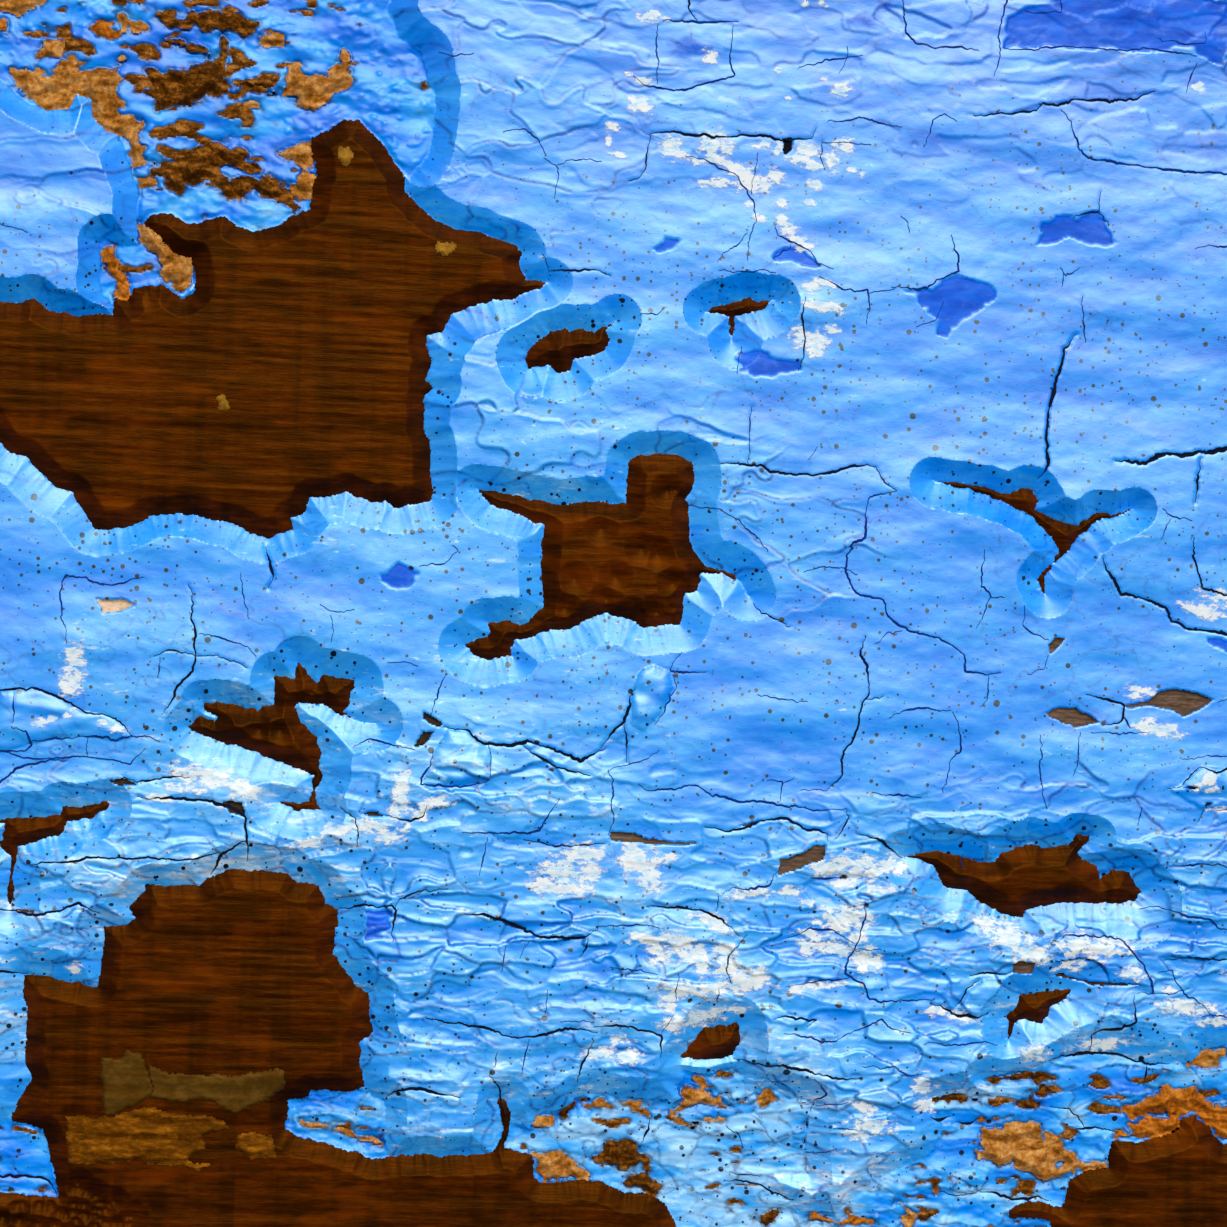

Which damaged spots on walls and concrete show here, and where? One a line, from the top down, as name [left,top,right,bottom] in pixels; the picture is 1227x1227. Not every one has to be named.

leakage [658,126,866,253]
crack [629,90,1227,370]
peeling [0,40,776,687]
crack [1115,446,1227,596]
crack [354,408,1049,876]
crack [0,687,249,875]
peeling [0,636,677,1227]
leakage [524,840,677,899]
leakage [627,848,917,1034]
peeling [878,813,1182,948]
leakage [970,916,1149,983]
peeling [974,957,1227,1227]